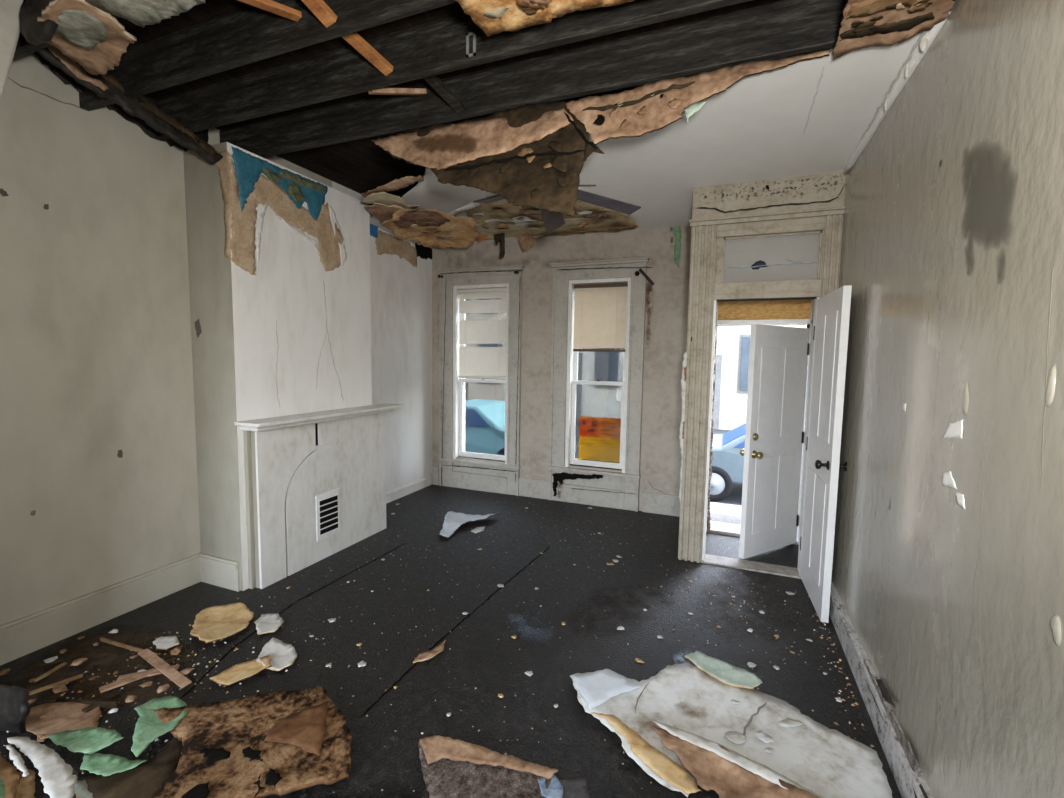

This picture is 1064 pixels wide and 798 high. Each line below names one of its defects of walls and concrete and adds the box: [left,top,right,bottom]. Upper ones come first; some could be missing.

peeling [85,0,206,28]
peeling [516,0,552,15]
peeling [833,0,955,60]
peeling [214,146,347,275]
peeling [370,224,432,267]
peeling [466,199,639,252]